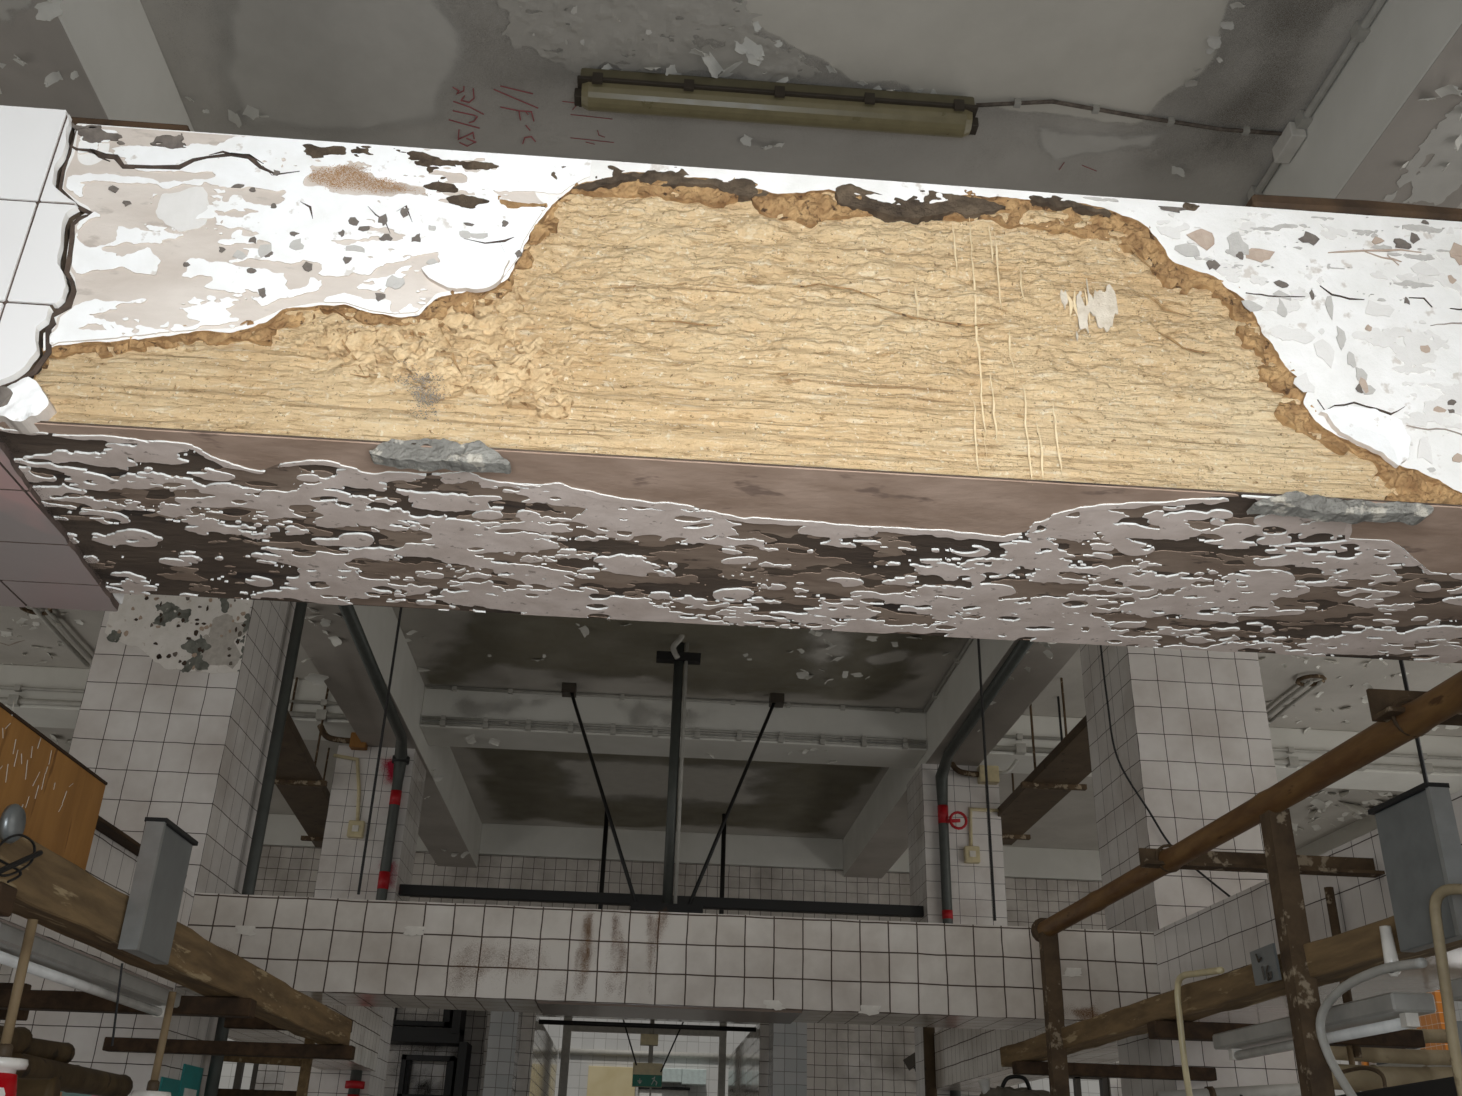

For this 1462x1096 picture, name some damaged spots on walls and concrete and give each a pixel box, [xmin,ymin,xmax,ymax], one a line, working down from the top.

peeling [34,0,63,21]
peeling [44,71,79,87]
water stain [341,0,1374,191]
peeling [497,0,1245,127]
crack [0,130,313,387]
flaking render [0,85,1462,734]